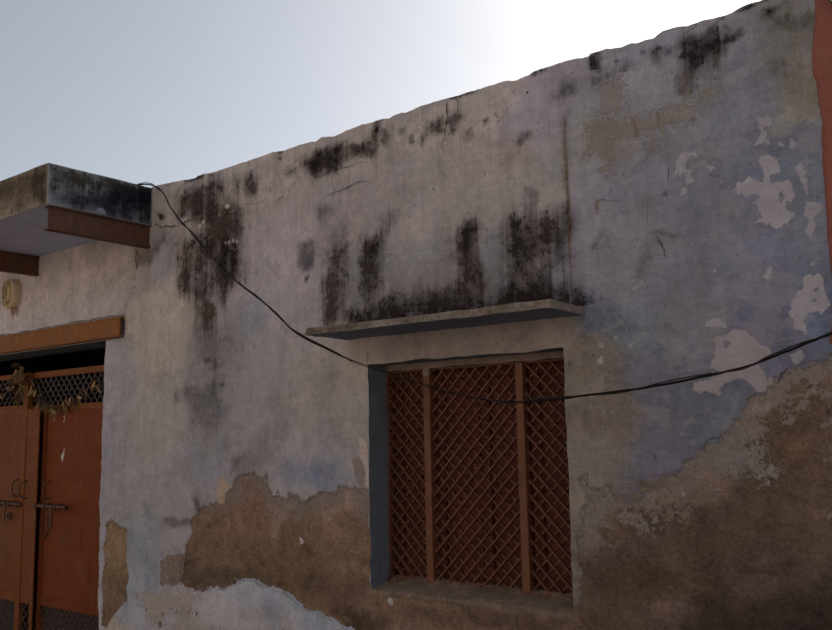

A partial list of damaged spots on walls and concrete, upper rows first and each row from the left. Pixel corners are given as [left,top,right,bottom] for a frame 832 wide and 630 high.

leakage [679,24,742,72]
leakage [0,166,162,223]
leakage [236,170,257,195]
leakage [304,120,389,177]
crack [420,89,478,154]
peeling [673,151,697,196]
peeling [734,116,824,239]
leakage [177,174,244,330]
leakage [306,205,594,333]
peeling [777,260,831,335]
flaking render [160,318,832,630]
flaking render [101,521,129,628]